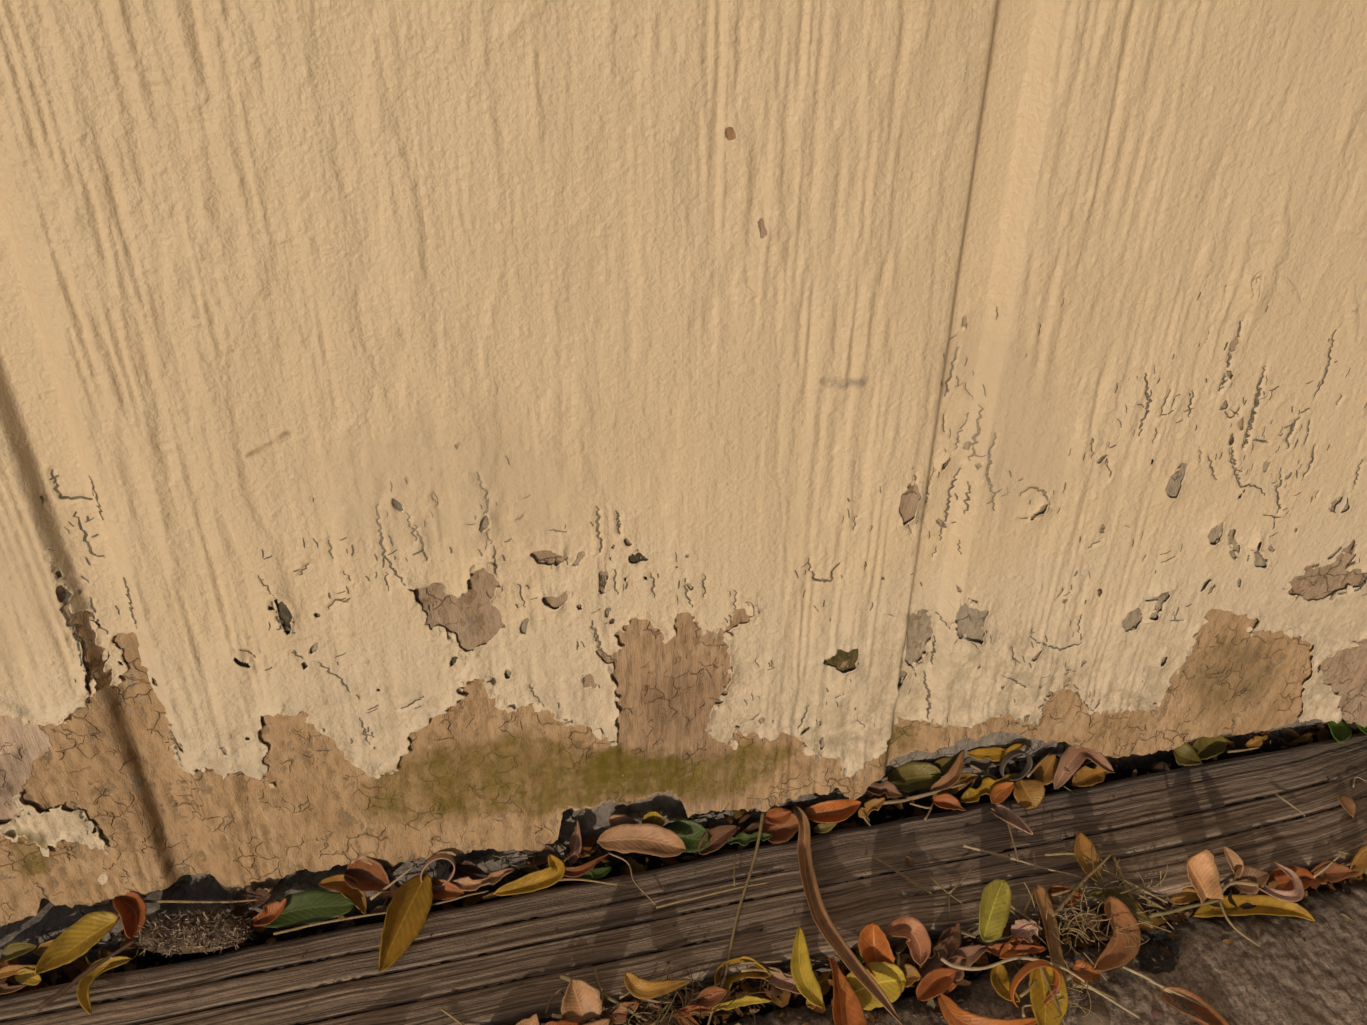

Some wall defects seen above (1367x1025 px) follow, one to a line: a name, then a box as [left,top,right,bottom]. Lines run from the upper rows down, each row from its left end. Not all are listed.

peeling [725,127,736,140]
peeling [758,219,767,238]
peeling [899,468,928,523]
crack [794,285,1351,722]
peeling [1166,463,1187,498]
peeling [1208,523,1275,571]
crack [1330,558,1367,600]
peeling [0,538,1367,927]